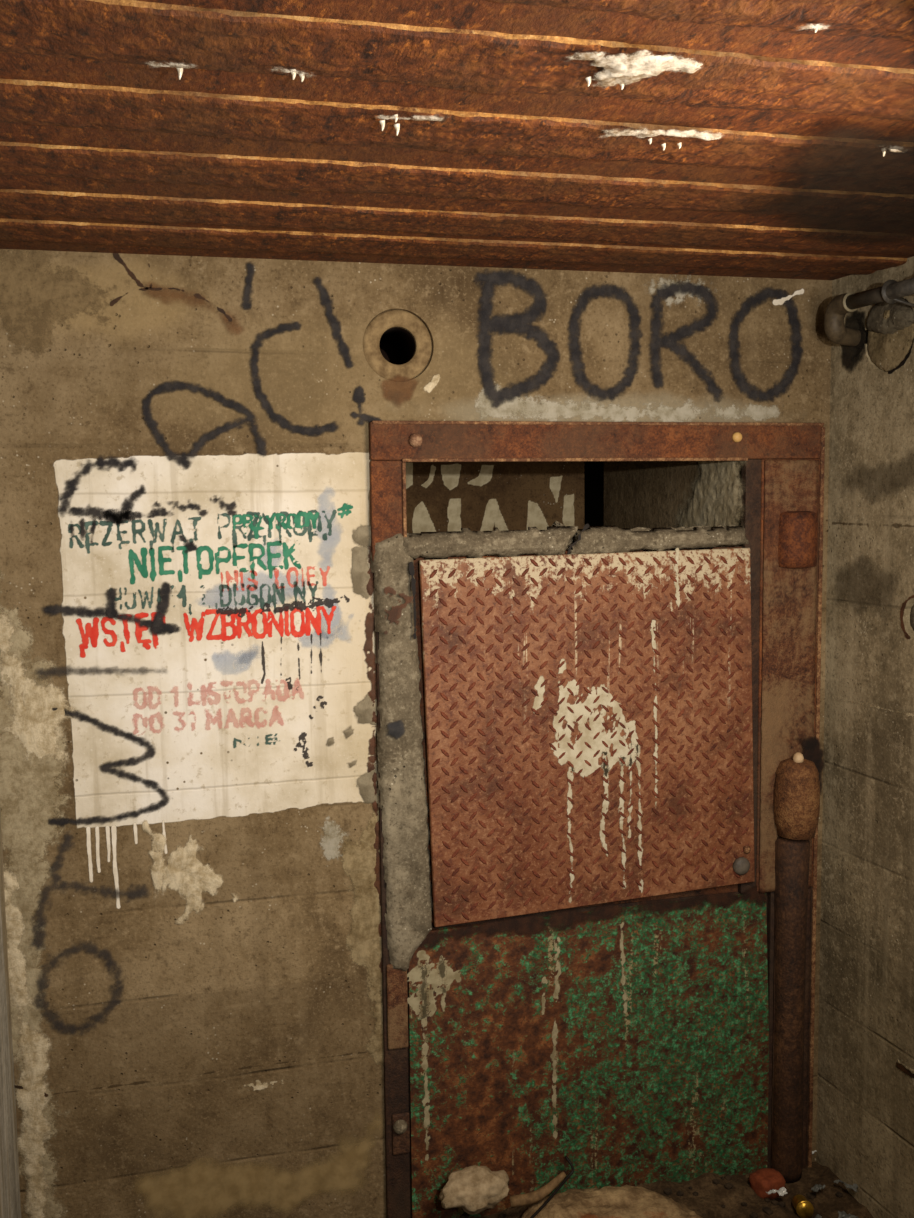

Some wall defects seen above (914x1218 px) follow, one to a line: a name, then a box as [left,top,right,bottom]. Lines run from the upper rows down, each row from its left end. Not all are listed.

damp [568,50,703,90]
damp [378,114,443,136]
damp [605,127,721,151]
peeling [142,820,238,924]